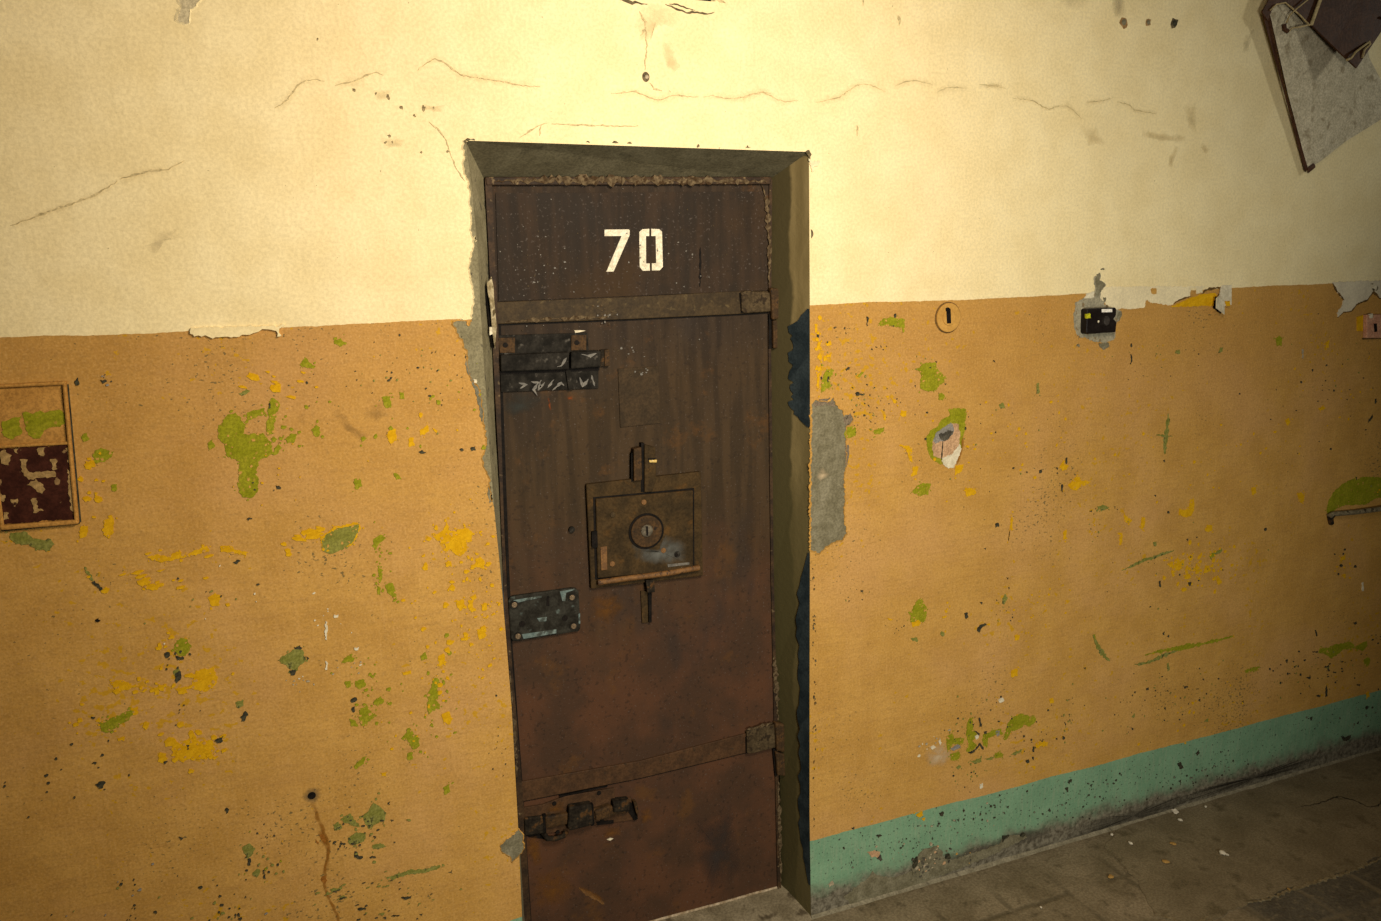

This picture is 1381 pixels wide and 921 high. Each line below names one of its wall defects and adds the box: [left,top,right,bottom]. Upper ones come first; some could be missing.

flaking render [174,0,202,26]
crack [275,72,382,108]
crack [418,58,540,87]
crack [521,0,1156,137]
crack [10,161,183,226]
flaking render [346,138,497,505]
peeling [1073,268,1232,380]
peeling [1332,280,1381,318]
peeling [278,511,517,785]
flaking render [788,309,1091,885]
corrosion [308,792,339,920]
flaking render [499,828,525,863]